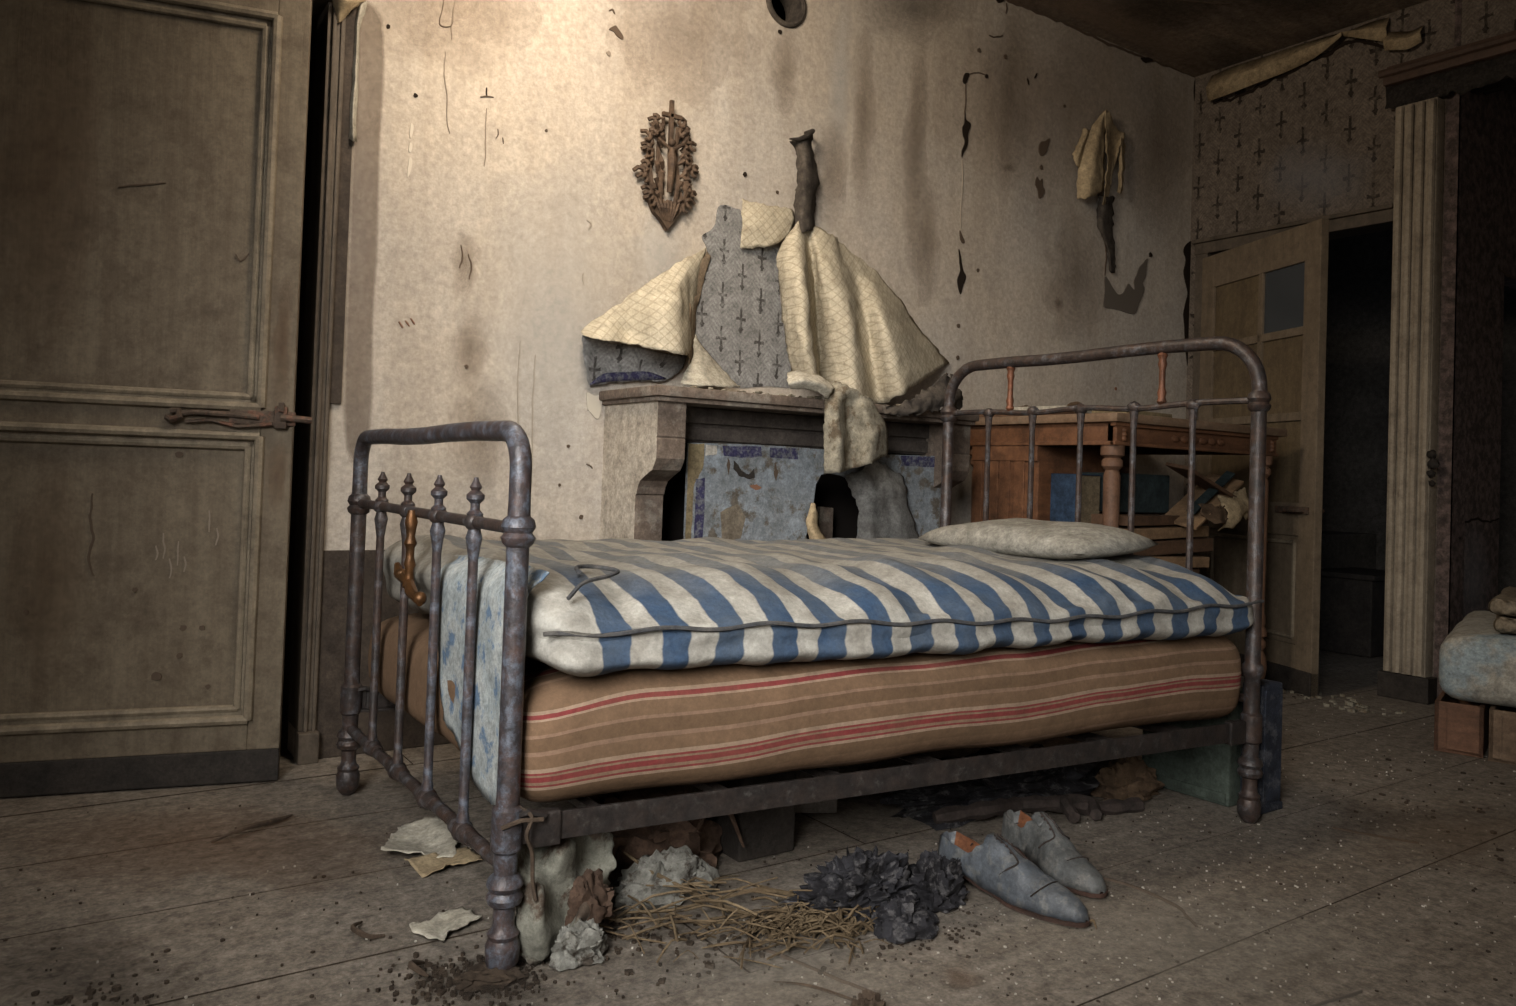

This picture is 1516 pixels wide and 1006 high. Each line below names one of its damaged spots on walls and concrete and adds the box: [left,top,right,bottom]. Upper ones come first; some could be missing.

peeling [1194,18,1424,101]
flaking render [961,113,971,157]
flaking render [957,230,980,294]
flaking render [1103,259,1148,314]